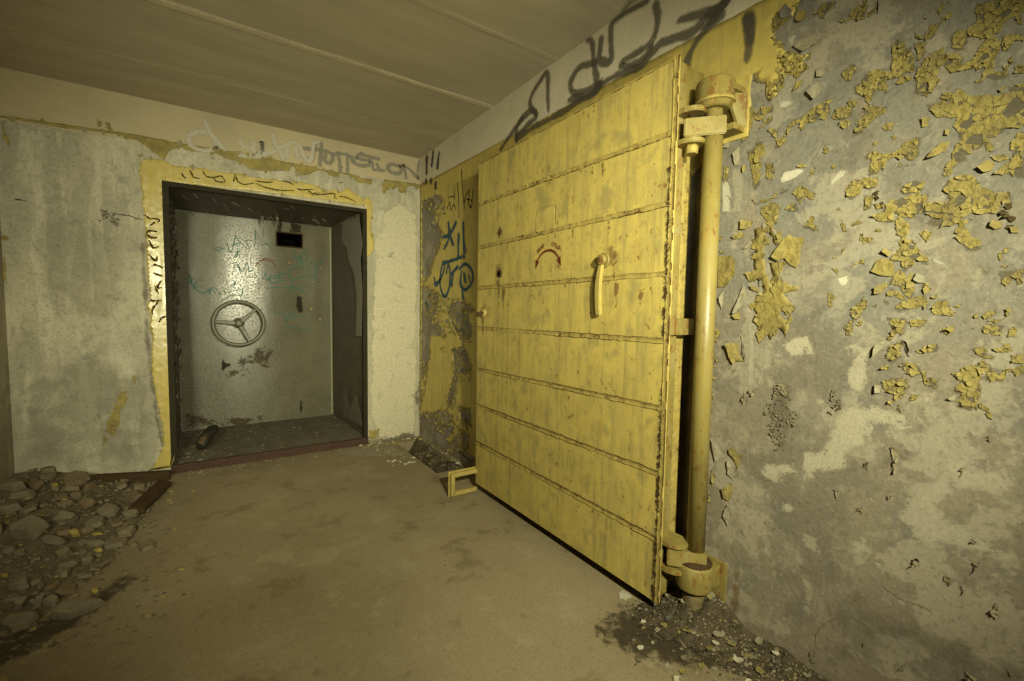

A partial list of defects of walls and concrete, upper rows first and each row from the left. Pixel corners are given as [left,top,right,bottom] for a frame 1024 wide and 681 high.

peeling [103,374,137,444]
peeling [368,182,475,455]
spalling [764,383,799,451]
peeling [712,0,1024,419]